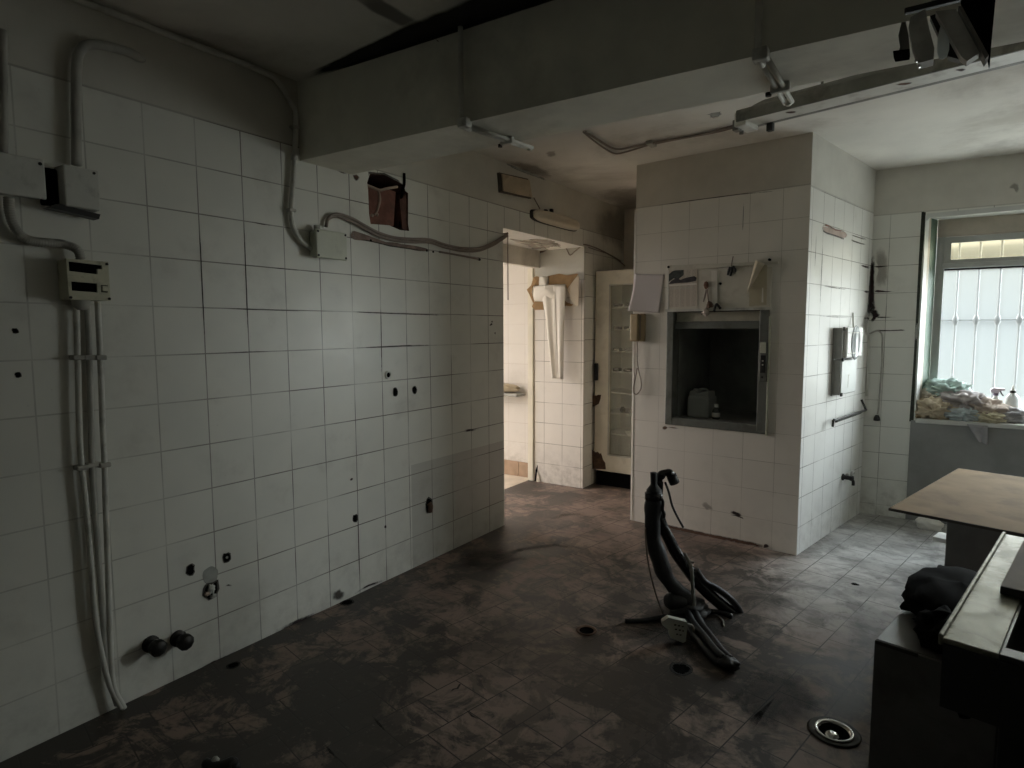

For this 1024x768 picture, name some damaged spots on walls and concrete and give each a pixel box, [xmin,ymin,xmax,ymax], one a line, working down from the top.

rust [592,450,606,469]